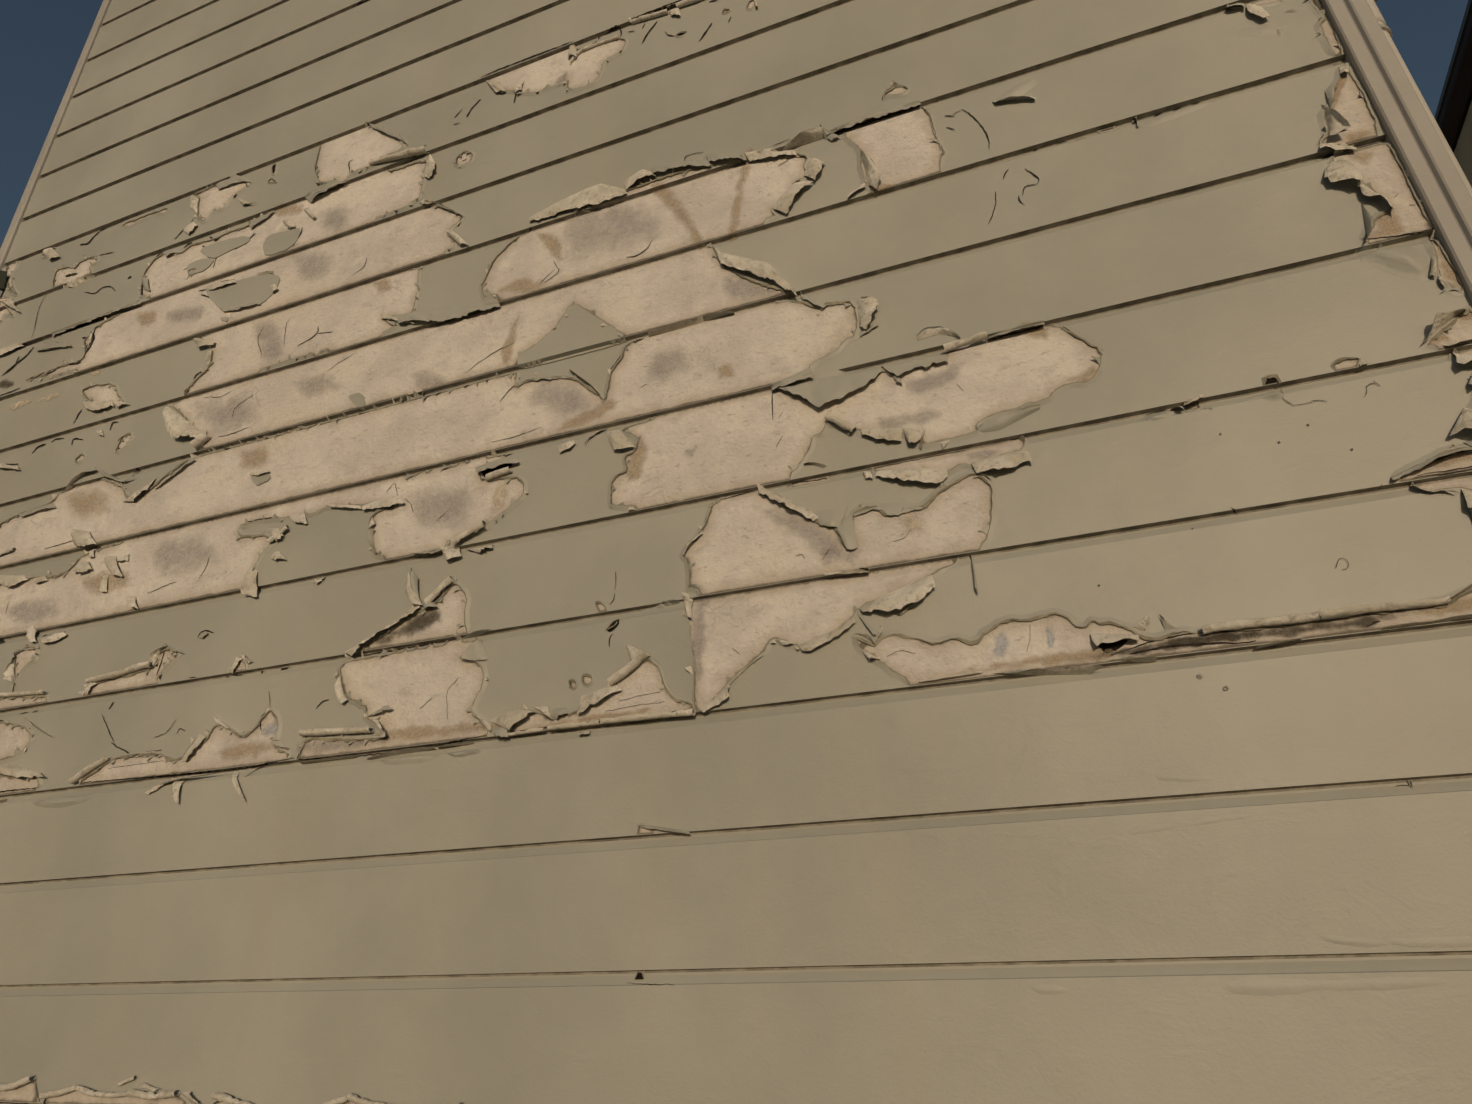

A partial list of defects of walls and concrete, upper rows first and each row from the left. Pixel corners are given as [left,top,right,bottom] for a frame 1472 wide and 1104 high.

peeling [453,0,716,125]
peeling [1226,0,1286,18]
peeling [1304,0,1472,513]
peeling [0,76,1472,804]
peeling [0,1075,253,1104]